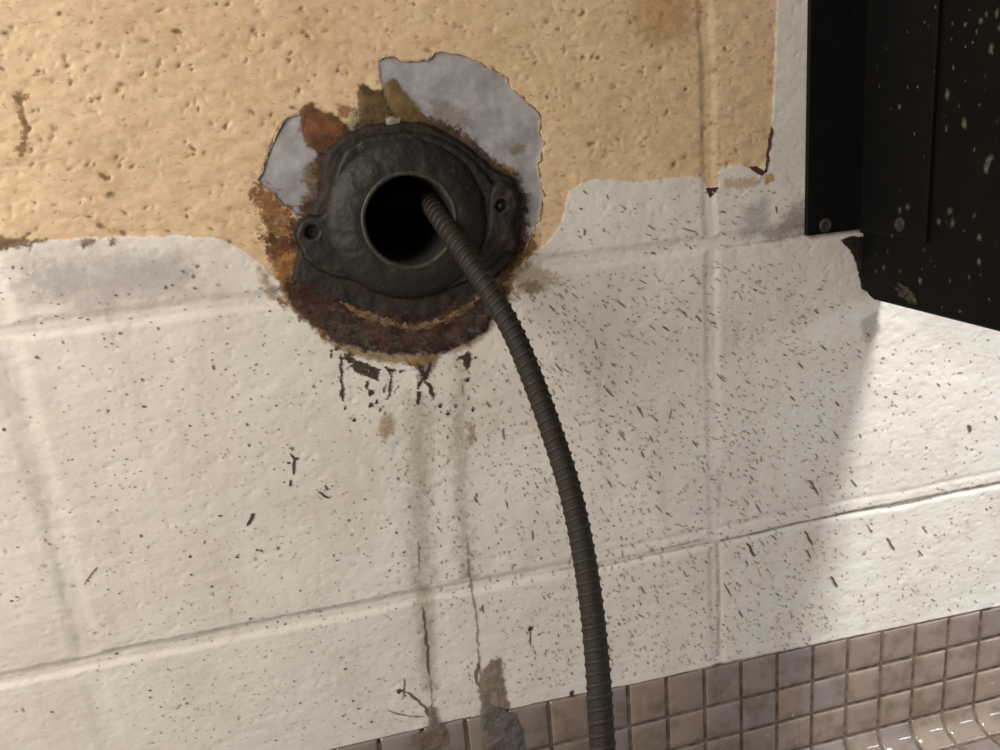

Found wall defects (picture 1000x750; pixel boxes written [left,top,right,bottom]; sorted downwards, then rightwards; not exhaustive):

peeling [257,114,319,218]
rust [248,102,493,366]
peeling [360,51,545,257]
rust [423,107,557,301]
peeling [750,126,773,176]
crack [387,607,433,718]
crack [473,663,481,686]